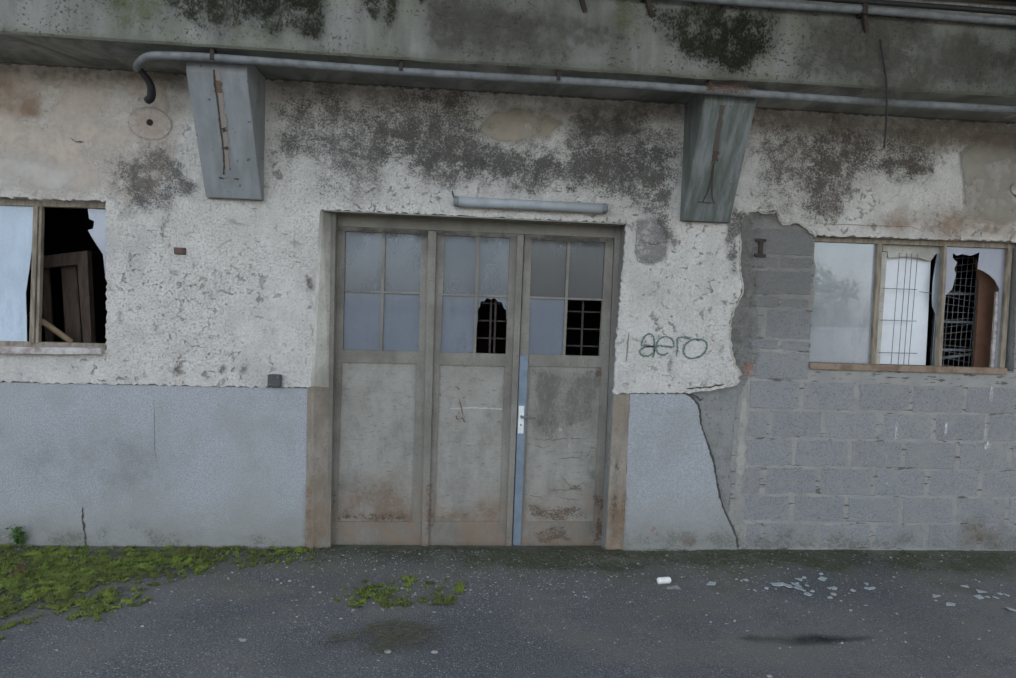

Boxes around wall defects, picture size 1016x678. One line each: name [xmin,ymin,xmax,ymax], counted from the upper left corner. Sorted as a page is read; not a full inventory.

damp [114,143,196,211]
damp [275,80,683,240]
damp [751,108,1016,224]
damp [725,208,745,271]
flaking render [684,209,817,394]
spalling [879,253,931,365]
crack [687,393,739,548]